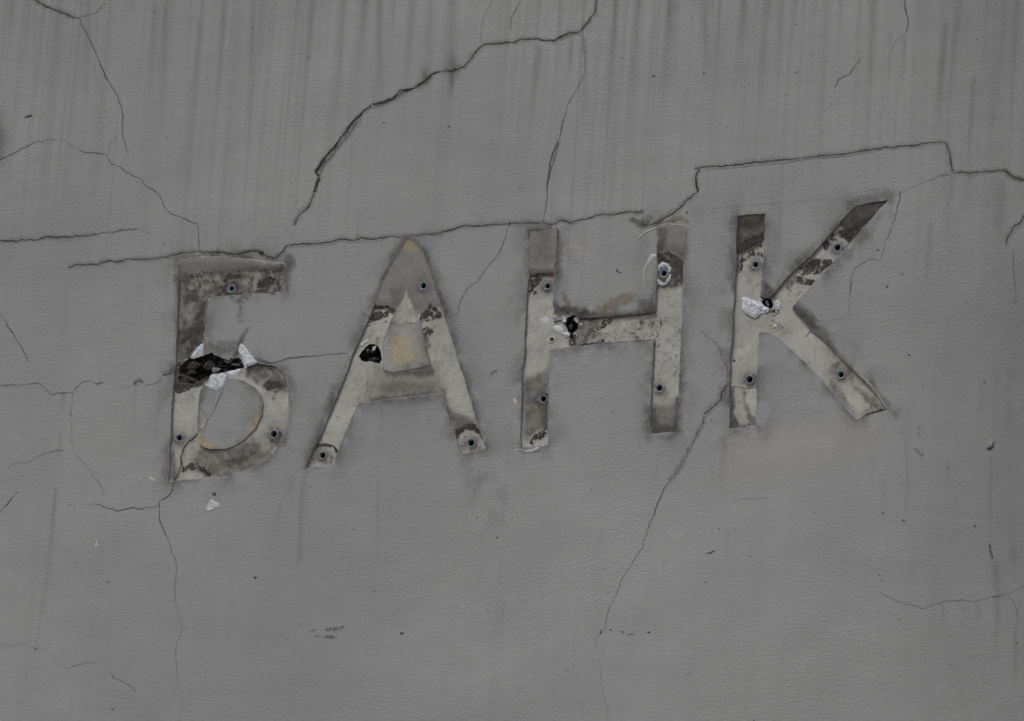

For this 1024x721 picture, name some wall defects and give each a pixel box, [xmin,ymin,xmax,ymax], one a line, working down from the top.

crack [72,0,1024,267]
crack [0,235,67,243]
spalling [178,343,258,391]
crack [669,385,727,481]
crack [113,434,198,533]